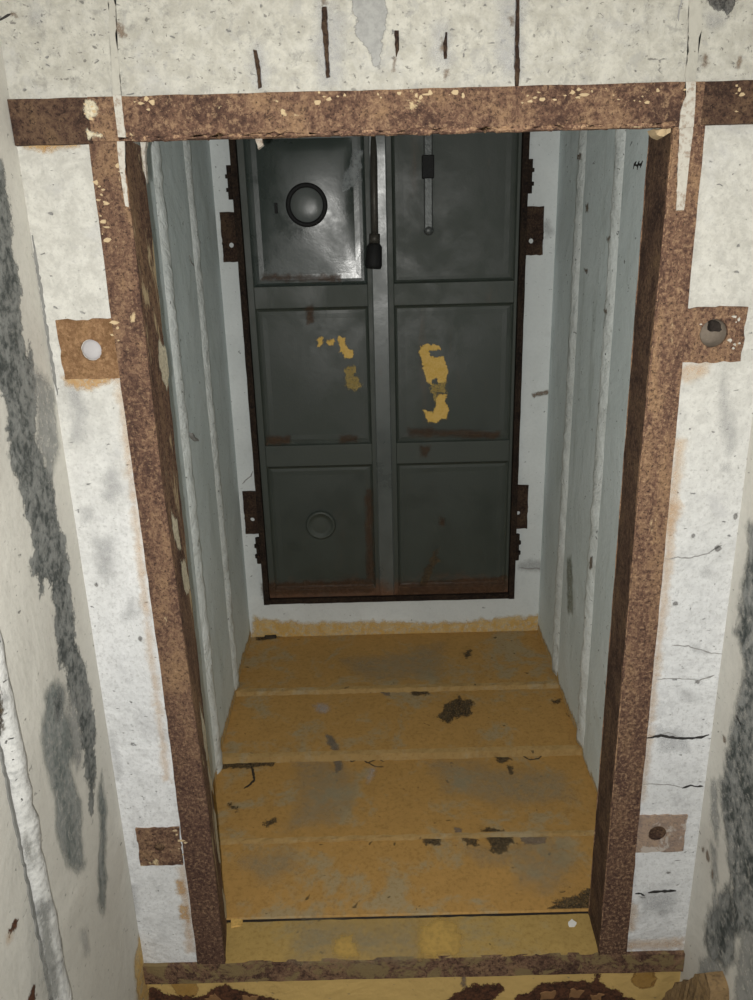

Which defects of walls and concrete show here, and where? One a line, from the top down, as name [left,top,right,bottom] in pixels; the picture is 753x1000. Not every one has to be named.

rust [321,0,330,78]
peeling [352,0,388,68]
rust [253,50,262,89]
leakage [0,159,106,908]
crack [668,545,722,560]
crack [647,732,709,740]
leakage [699,524,753,1000]
rust [176,881,189,919]
crack [635,889,676,898]